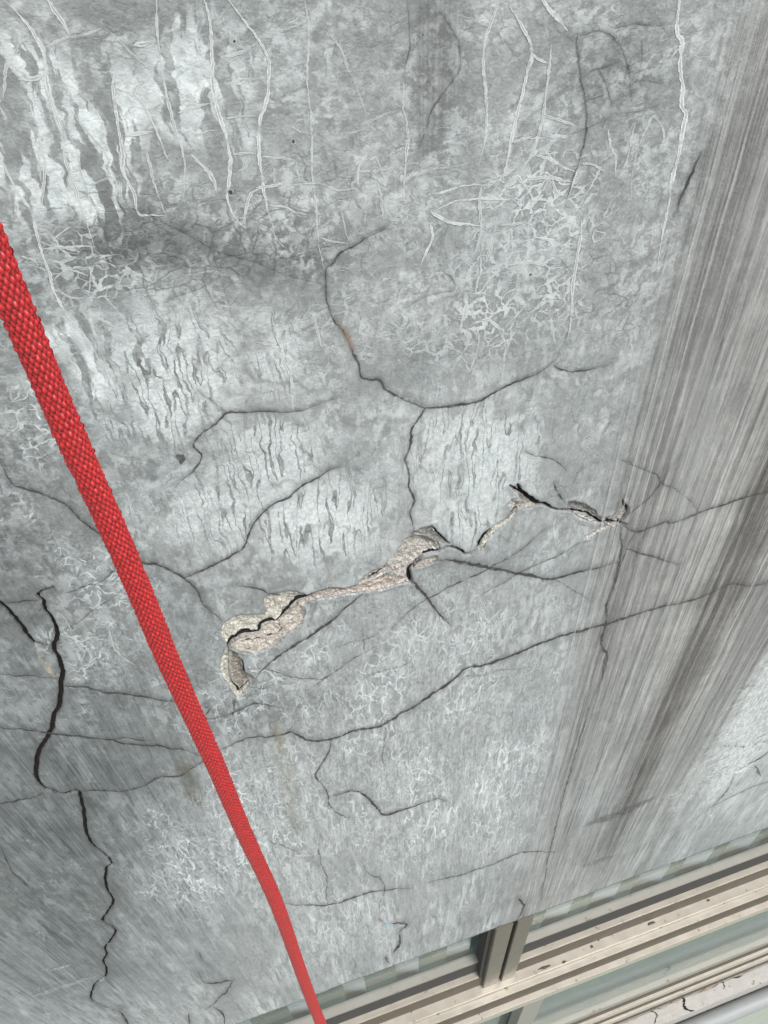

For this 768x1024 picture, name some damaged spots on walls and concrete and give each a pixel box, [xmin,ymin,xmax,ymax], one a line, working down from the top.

leakage [0,0,410,377]
leakage [421,0,656,264]
leakage [657,0,692,268]
crack [177,399,333,485]
crack [325,228,593,535]
leakage [468,310,521,379]
spalling [477,483,628,550]
leakage [537,220,606,342]
spalling [219,526,464,698]
crack [0,455,767,998]
crack [188,953,233,1024]